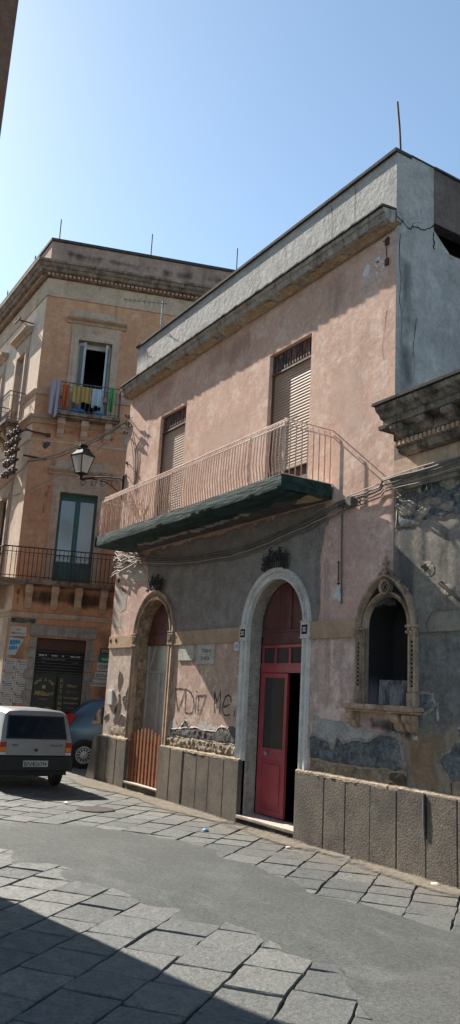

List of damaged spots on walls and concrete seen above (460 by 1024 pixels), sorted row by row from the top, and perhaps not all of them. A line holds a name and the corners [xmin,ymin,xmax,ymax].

crack [382,213,435,378]
flaking render [395,476,460,528]
flaking render [167,715,236,756]
flaking render [309,716,418,787]
flaking render [439,726,460,785]